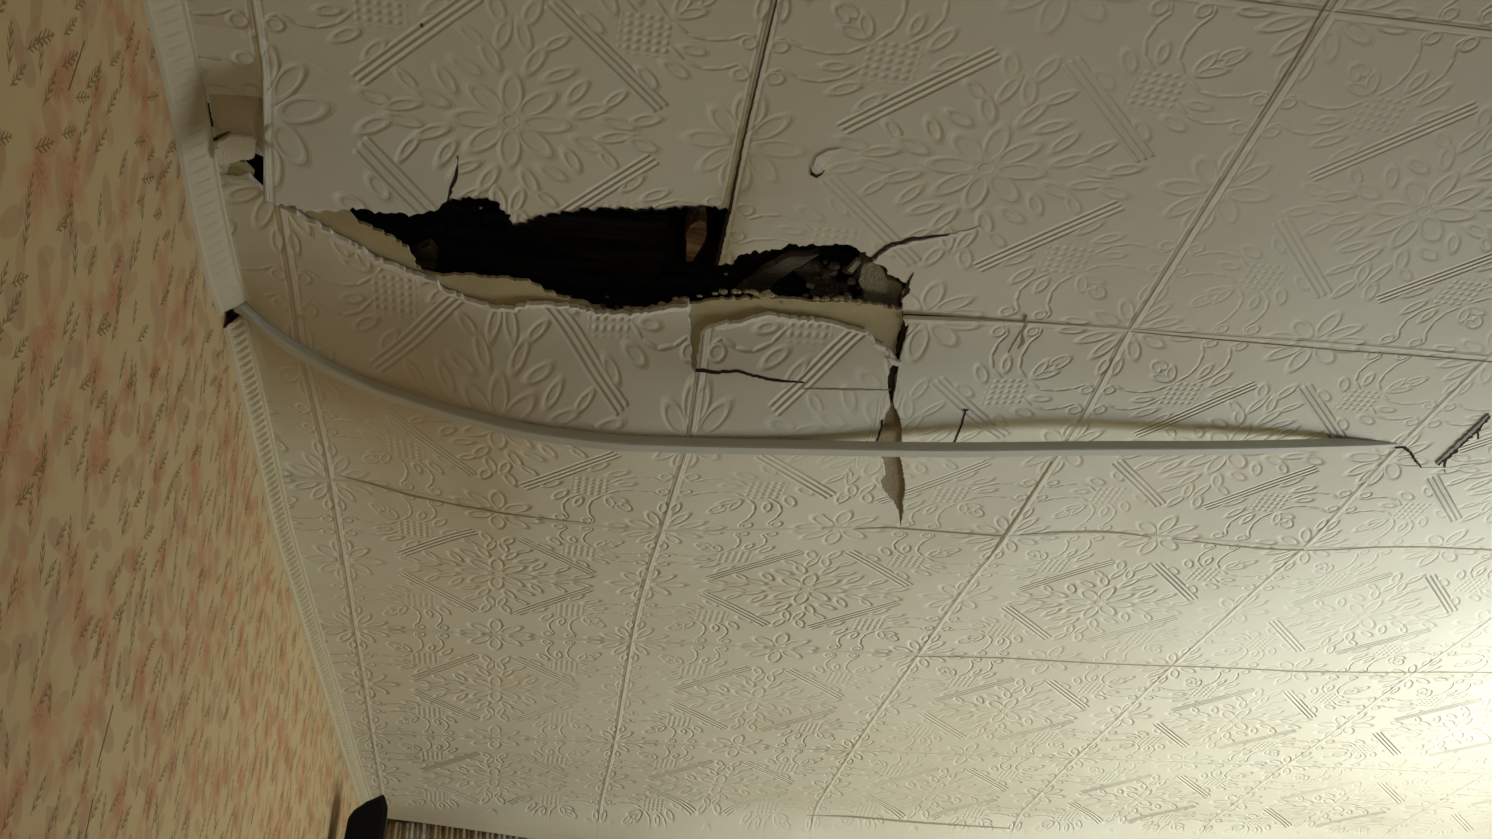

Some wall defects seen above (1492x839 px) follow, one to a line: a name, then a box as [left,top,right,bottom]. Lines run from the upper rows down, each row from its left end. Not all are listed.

crack [695,226,981,442]
crack [1394,414,1491,473]